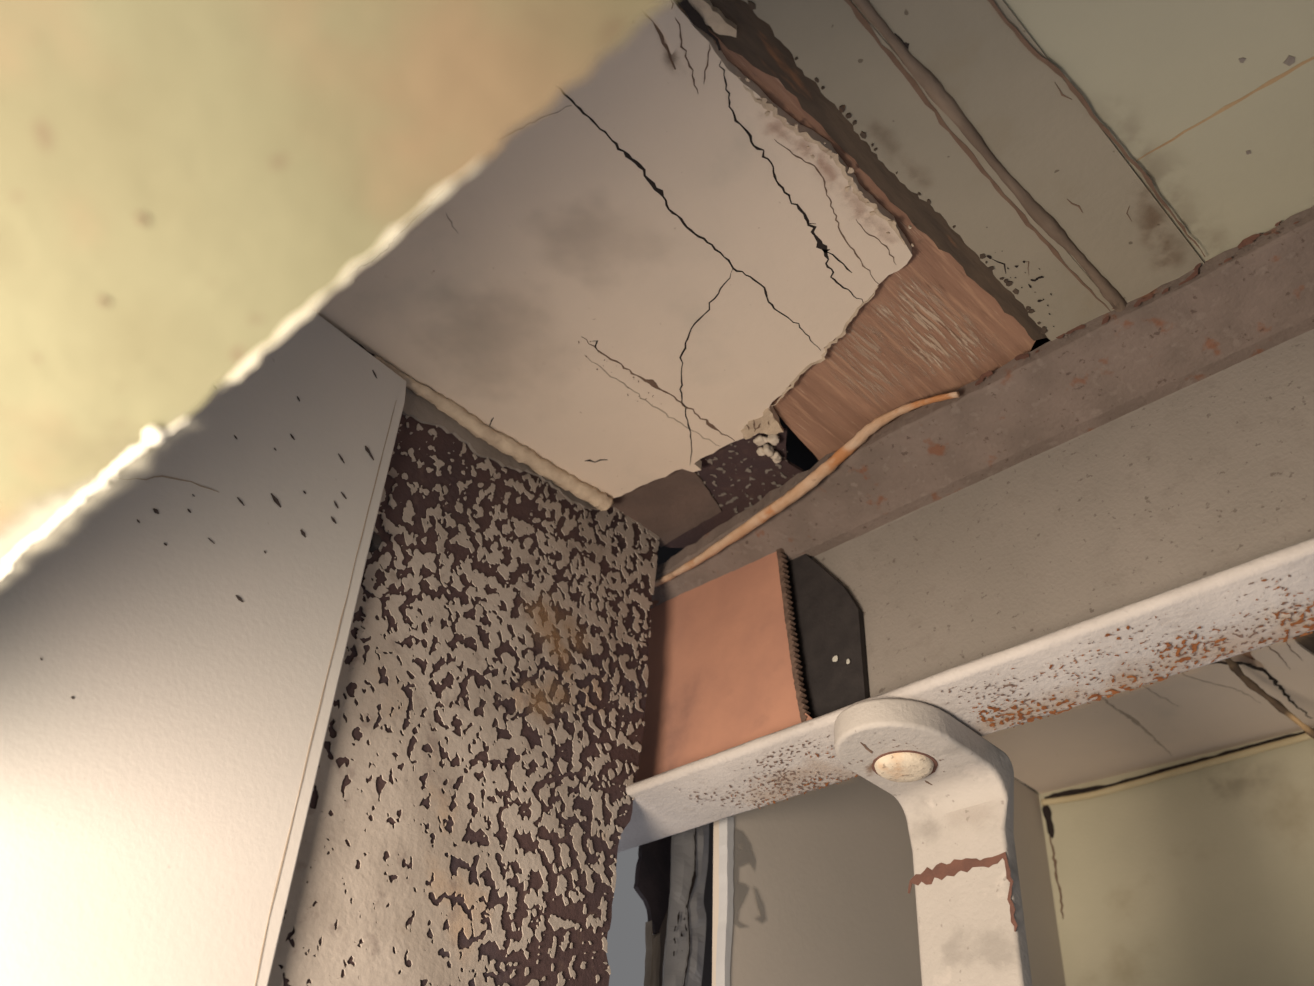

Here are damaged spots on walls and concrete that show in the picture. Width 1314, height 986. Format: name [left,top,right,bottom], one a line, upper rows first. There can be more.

crack [506,90,820,462]
crack [671,0,895,302]
spalling [738,76,914,247]
peeling [698,283,983,513]
peeling [980,252,1054,334]
peeling [268,339,660,986]
corrosion [941,574,1314,731]
crack [1042,640,1314,919]